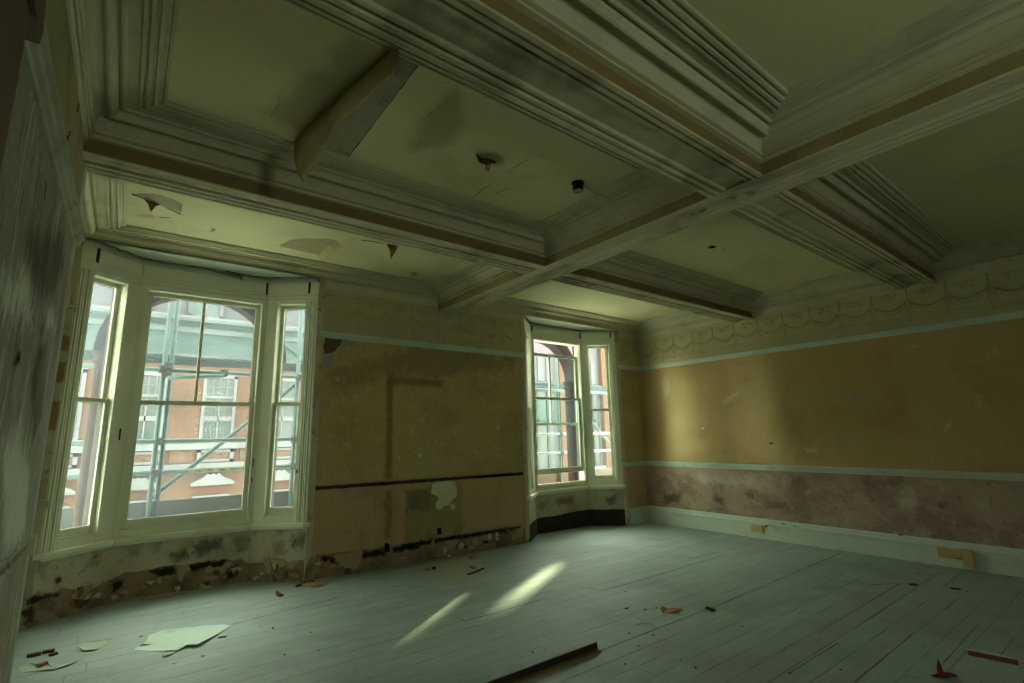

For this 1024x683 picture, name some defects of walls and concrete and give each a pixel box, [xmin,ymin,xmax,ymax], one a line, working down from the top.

flaking render [323,338,357,368]
leakage [682,461,789,505]
flaking render [69,561,243,609]
leakage [149,566,176,578]
leakage [189,559,237,582]
flaking render [253,551,362,582]